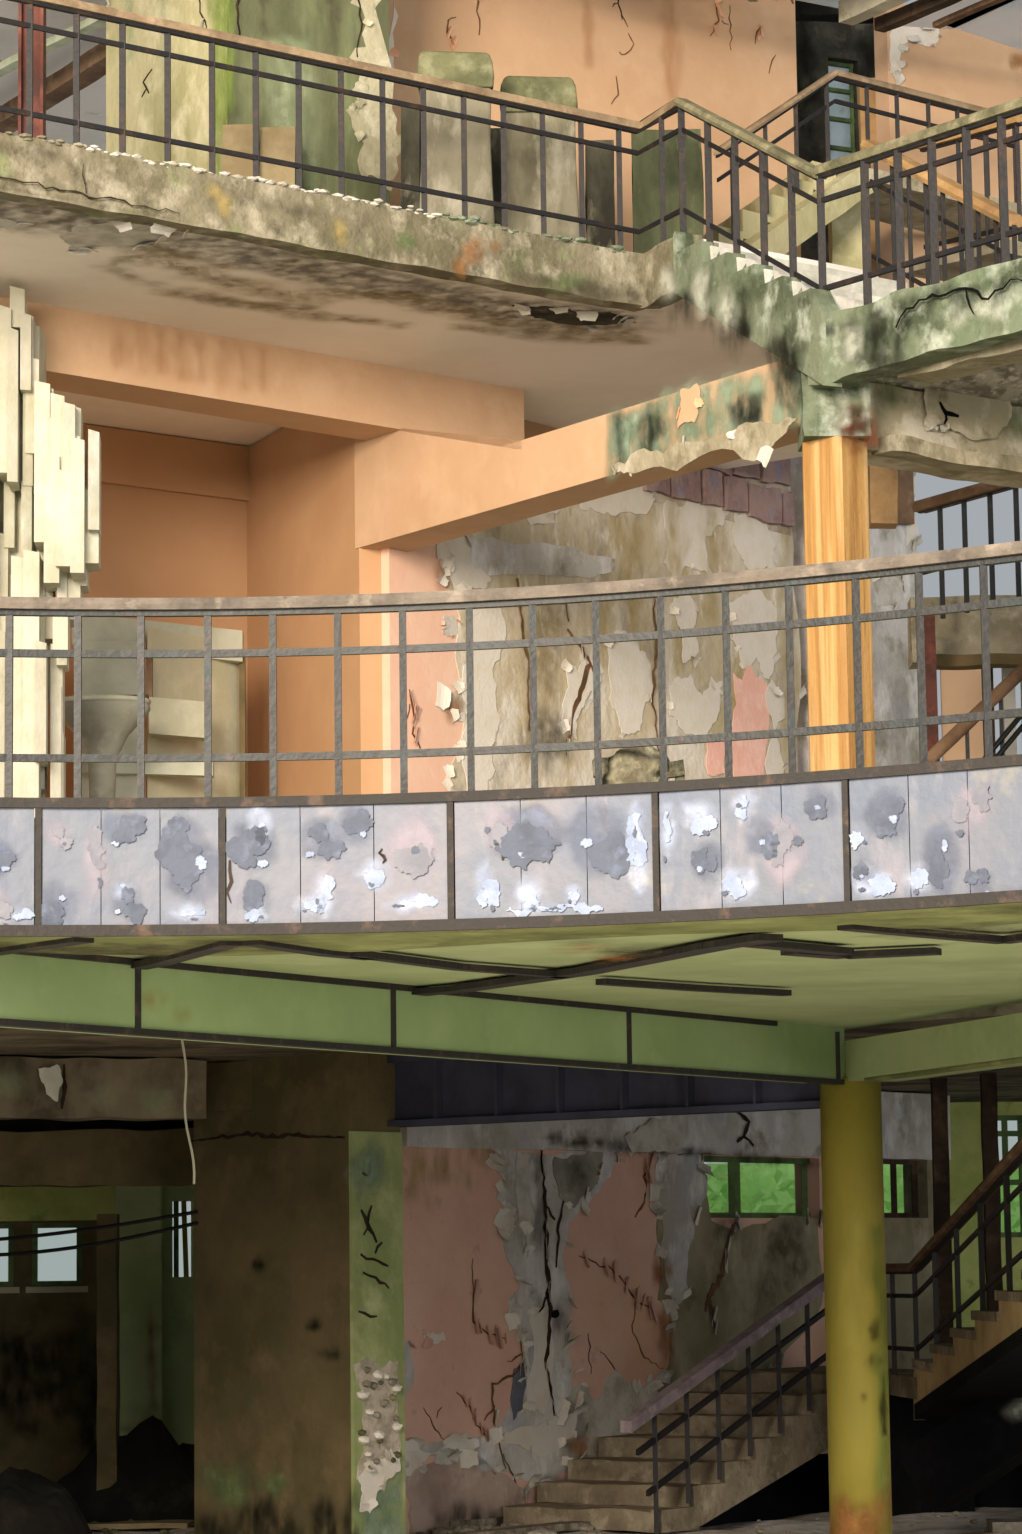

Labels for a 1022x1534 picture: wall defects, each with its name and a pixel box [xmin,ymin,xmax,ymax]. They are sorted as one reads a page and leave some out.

crack [355,0,363,57]
flaking render [0,0,625,255]
damp [0,201,105,228]
damp [121,232,639,342]
crack [895,278,1022,328]
flaking render [436,383,797,591]
flaking render [435,586,807,791]
crack [358,1172,389,1318]
crack [423,1150,663,1483]
flaking render [354,1118,823,1534]
damp [81,1369,97,1450]
rust [830,1499,886,1534]